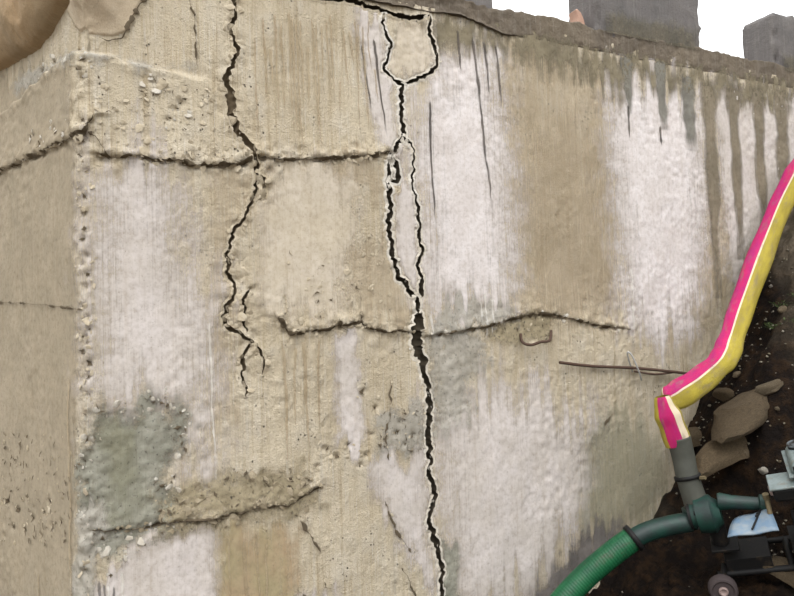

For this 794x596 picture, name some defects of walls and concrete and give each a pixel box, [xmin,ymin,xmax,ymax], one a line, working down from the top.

crack [0,0,630,596]
water stain [433,13,794,289]